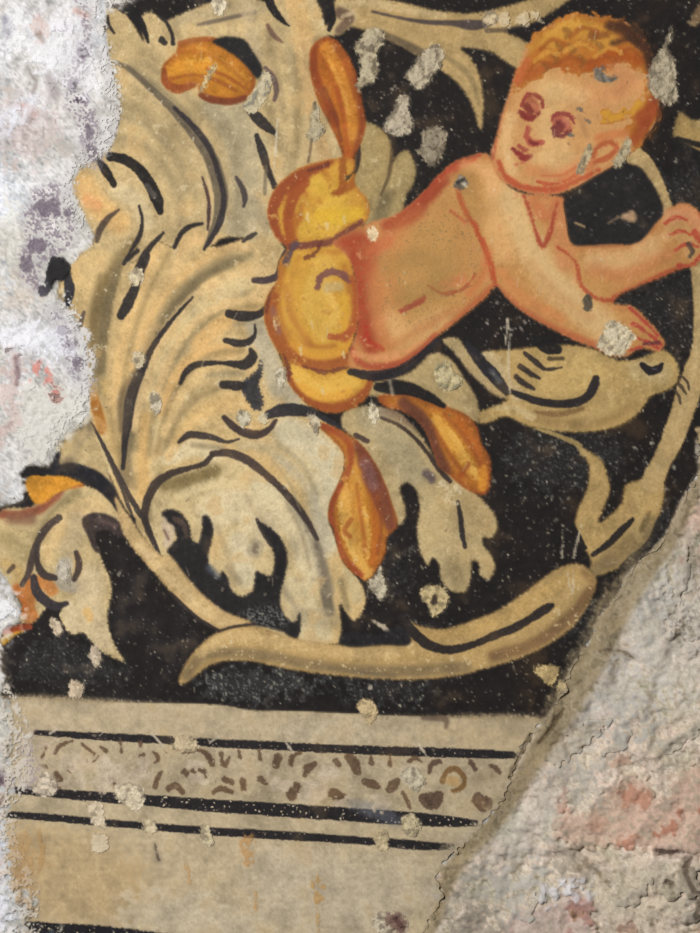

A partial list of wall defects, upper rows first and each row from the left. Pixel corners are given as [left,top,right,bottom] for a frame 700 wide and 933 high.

peeling [62,0,100,161]
spalling [354,27,385,92]
spalling [383,44,448,166]
spalling [648,26,679,106]
peeling [18,182,78,296]
spalling [596,320,637,357]
spalling [367,566,387,601]
spalling [49,617,63,636]
spalling [68,680,84,699]
spalling [88,646,102,668]
spalling [357,699,378,726]
spalling [420,427,700,933]